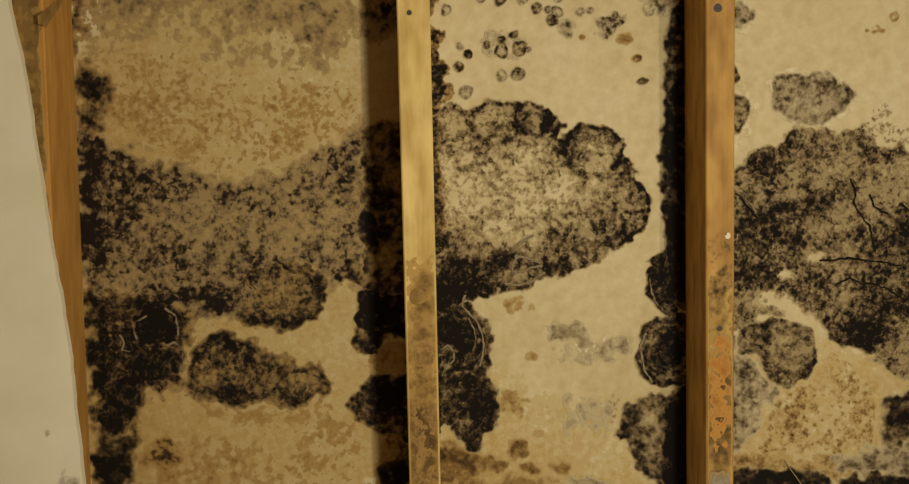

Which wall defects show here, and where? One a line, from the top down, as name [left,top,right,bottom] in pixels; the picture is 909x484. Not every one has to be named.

water stain [735,0,758,35]
water stain [865,11,900,34]
water stain [71,0,687,484]
water stain [709,62,909,484]